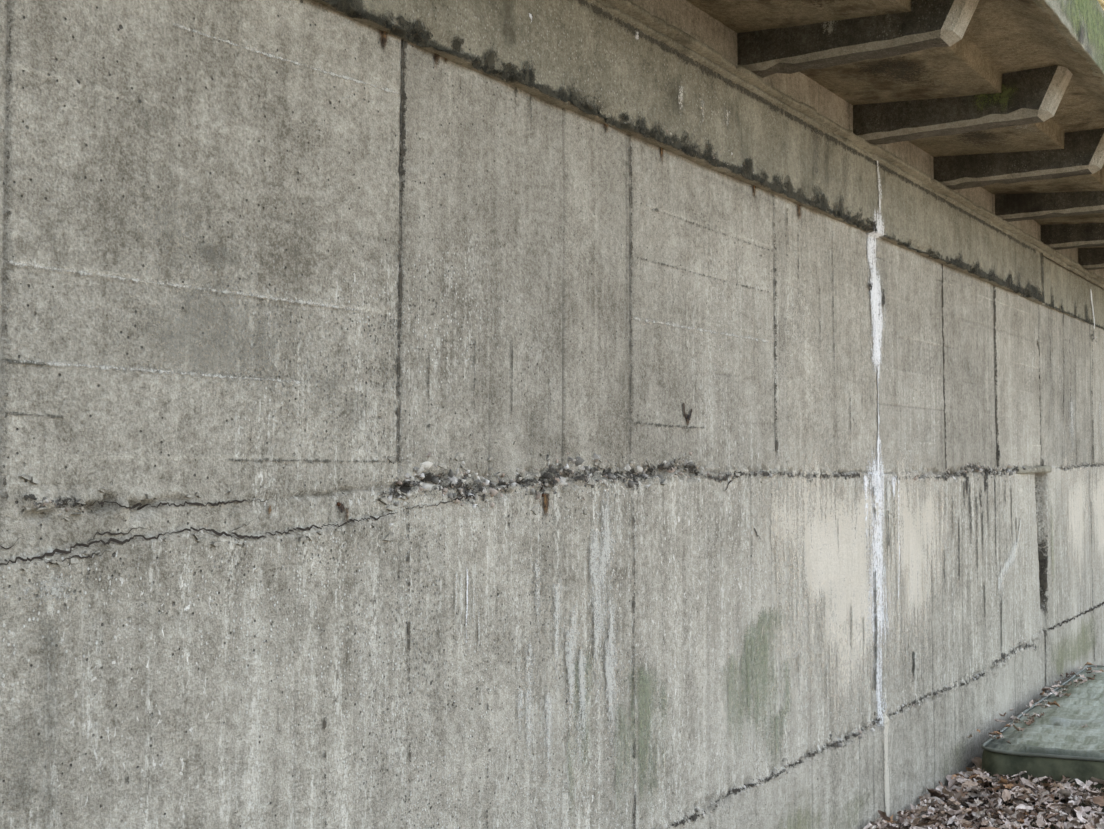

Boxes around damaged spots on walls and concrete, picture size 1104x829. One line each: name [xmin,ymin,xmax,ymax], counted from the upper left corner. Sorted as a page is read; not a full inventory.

spalling [378,426,772,541]
crack [0,487,484,571]
crack [1049,602,1104,632]